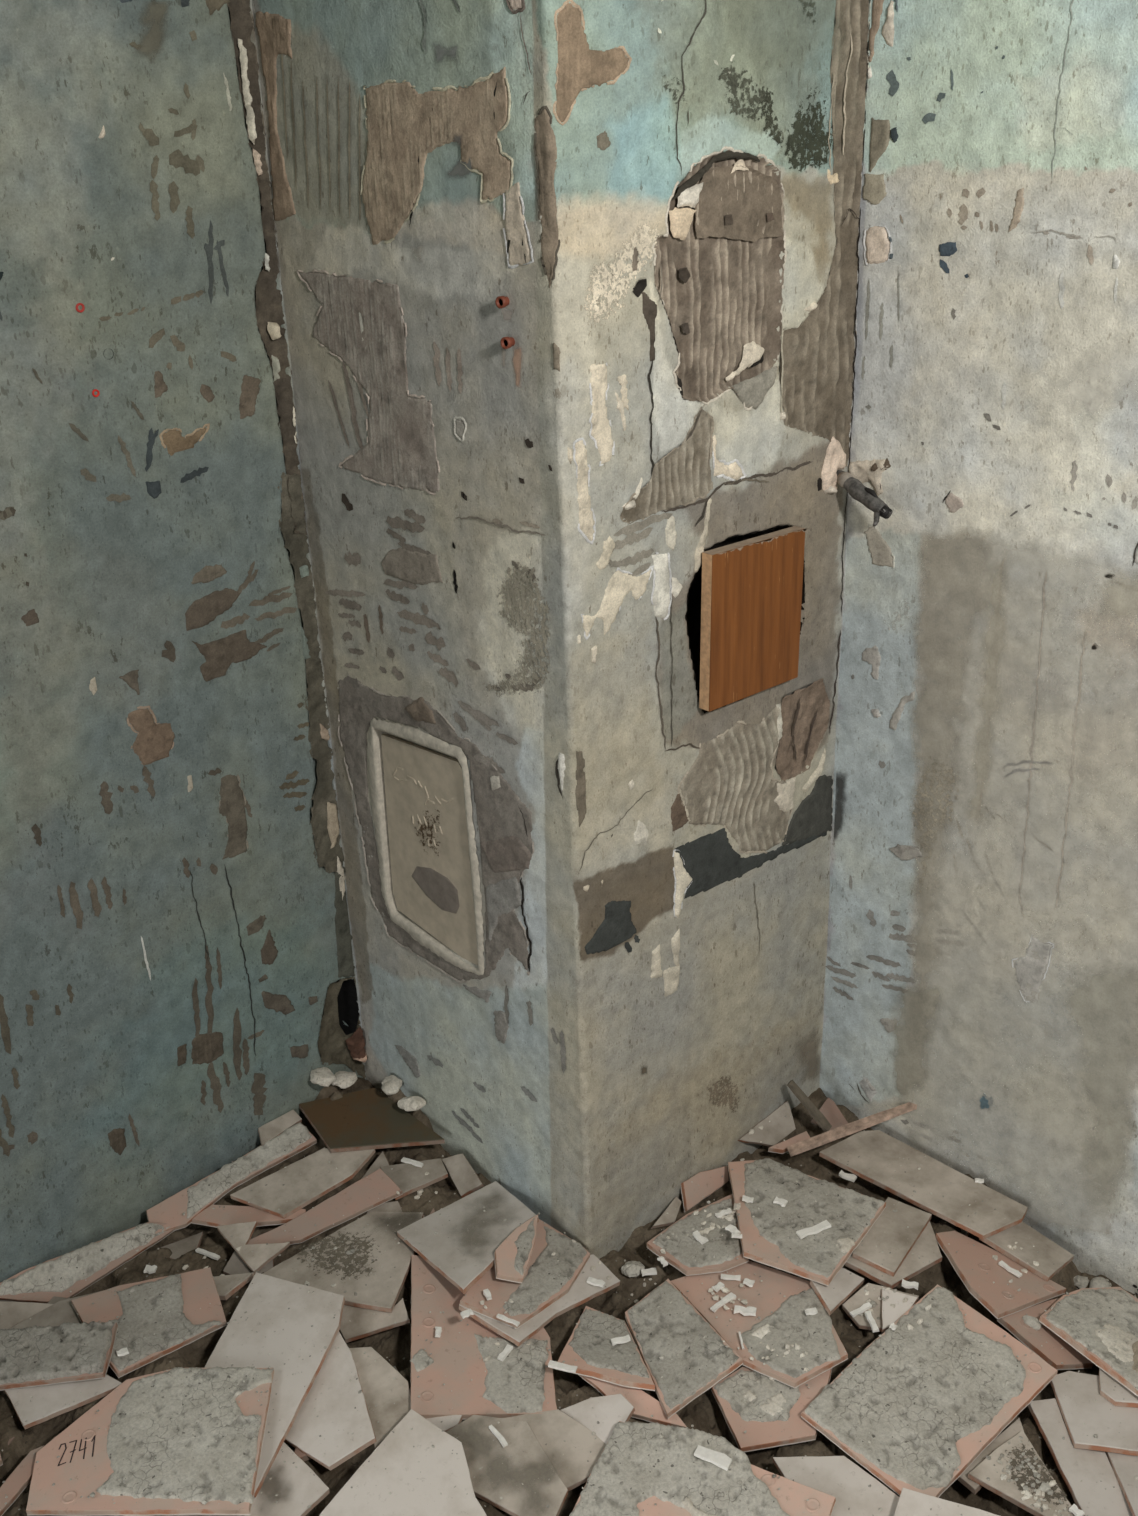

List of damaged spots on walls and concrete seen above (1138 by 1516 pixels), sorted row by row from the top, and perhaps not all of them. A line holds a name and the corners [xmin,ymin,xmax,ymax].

peeling [360,0,632,288]
crack [676,0,707,175]
leakage [719,62,835,172]
peeling [922,69,954,124]
peeling [939,188,1024,278]
spalling [553,343,561,372]
spalling [567,0,899,713]
peeling [1070,460,1078,491]
leakage [825,538,1007,1095]
spalling [0,472,1138,1516]